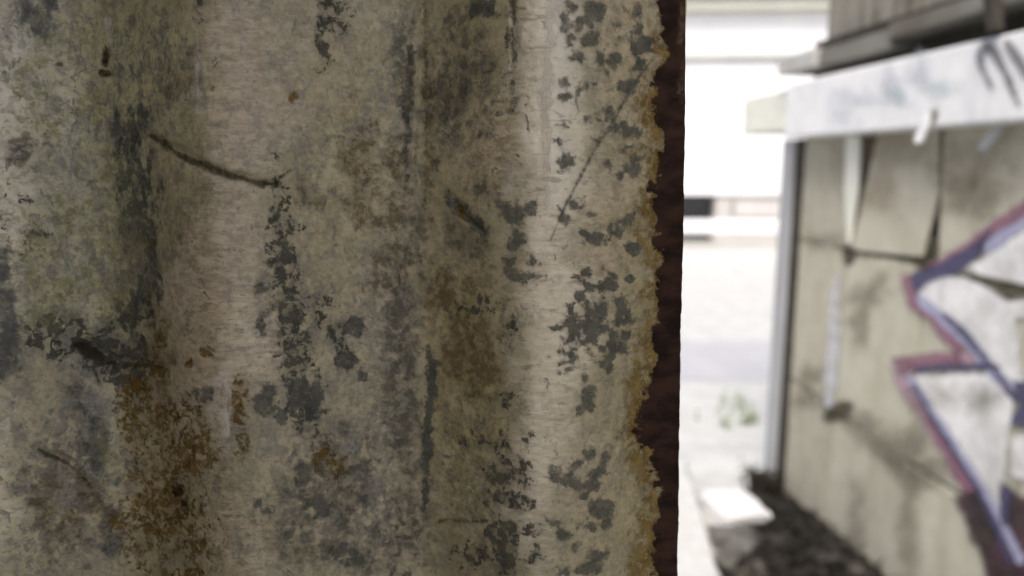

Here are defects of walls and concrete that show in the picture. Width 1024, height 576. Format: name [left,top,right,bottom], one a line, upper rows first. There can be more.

leakage [0,103,164,400]
leakage [264,152,362,435]
rust [624,0,686,576]
rust [82,322,250,576]
leakage [451,455,536,576]